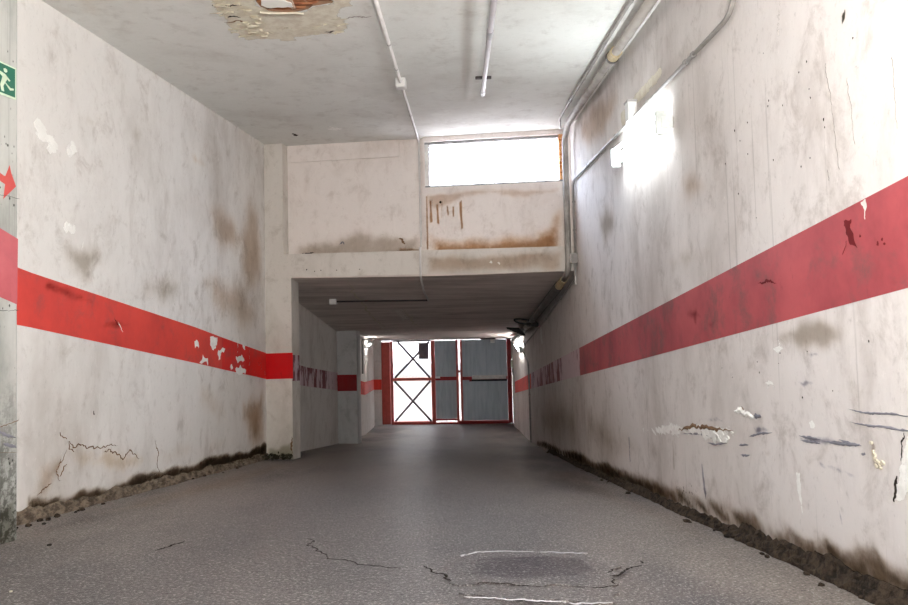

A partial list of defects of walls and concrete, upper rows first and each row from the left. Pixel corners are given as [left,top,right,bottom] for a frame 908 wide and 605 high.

peeling [210,0,352,41]
spalling [842,219,861,255]
peeling [194,336,225,365]
peeling [230,345,246,375]
flaking render [643,420,734,446]
damp [118,443,267,487]
damp [29,488,105,507]
damp [537,442,760,531]
flaking render [546,449,908,605]
crack [307,541,396,568]
damp [776,535,908,590]